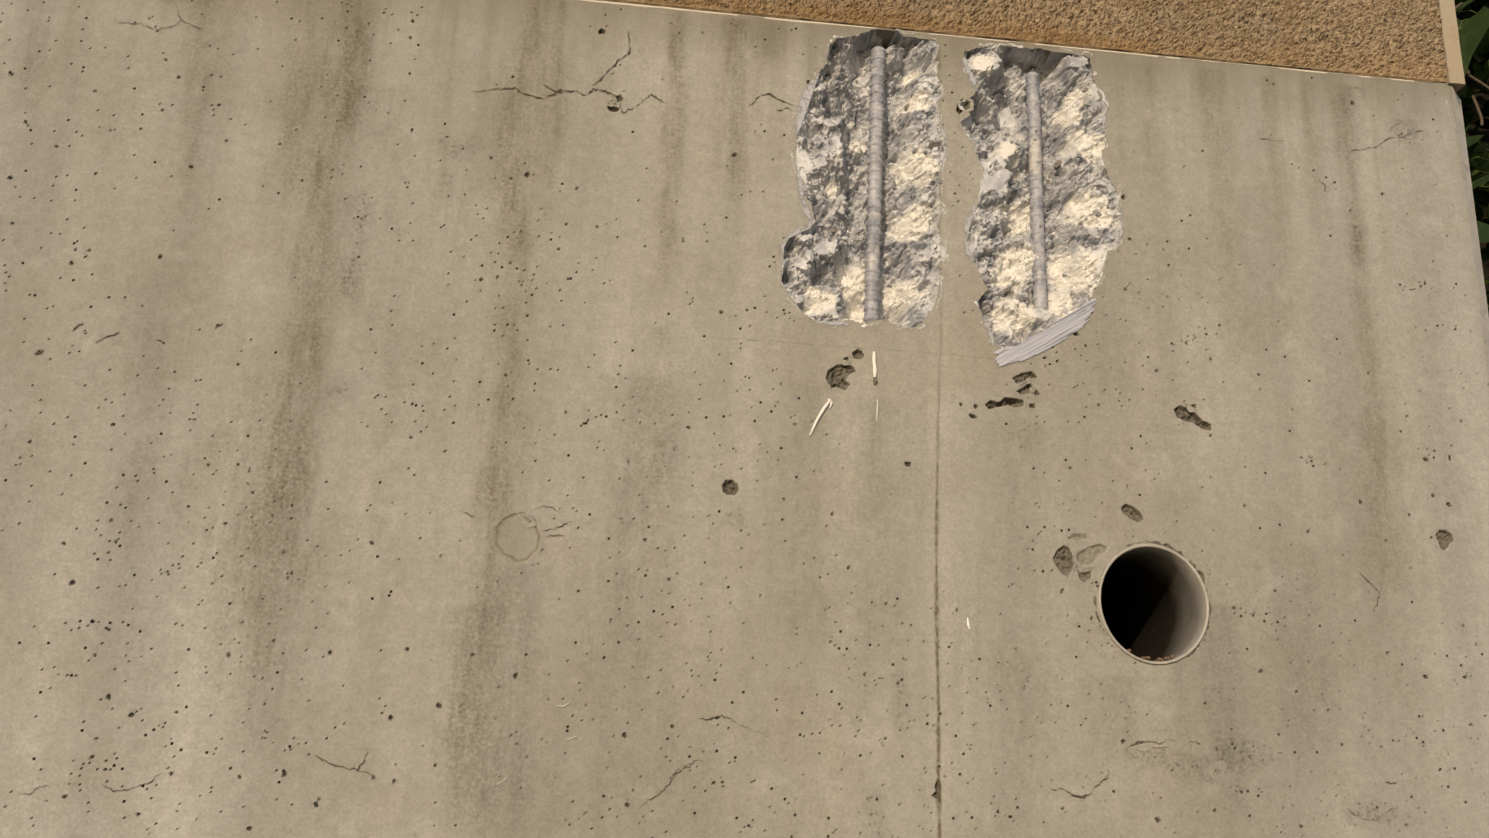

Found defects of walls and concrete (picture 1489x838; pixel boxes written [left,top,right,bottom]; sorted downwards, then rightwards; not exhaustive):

crack [477,31,663,113]
spalling [776,27,1125,366]